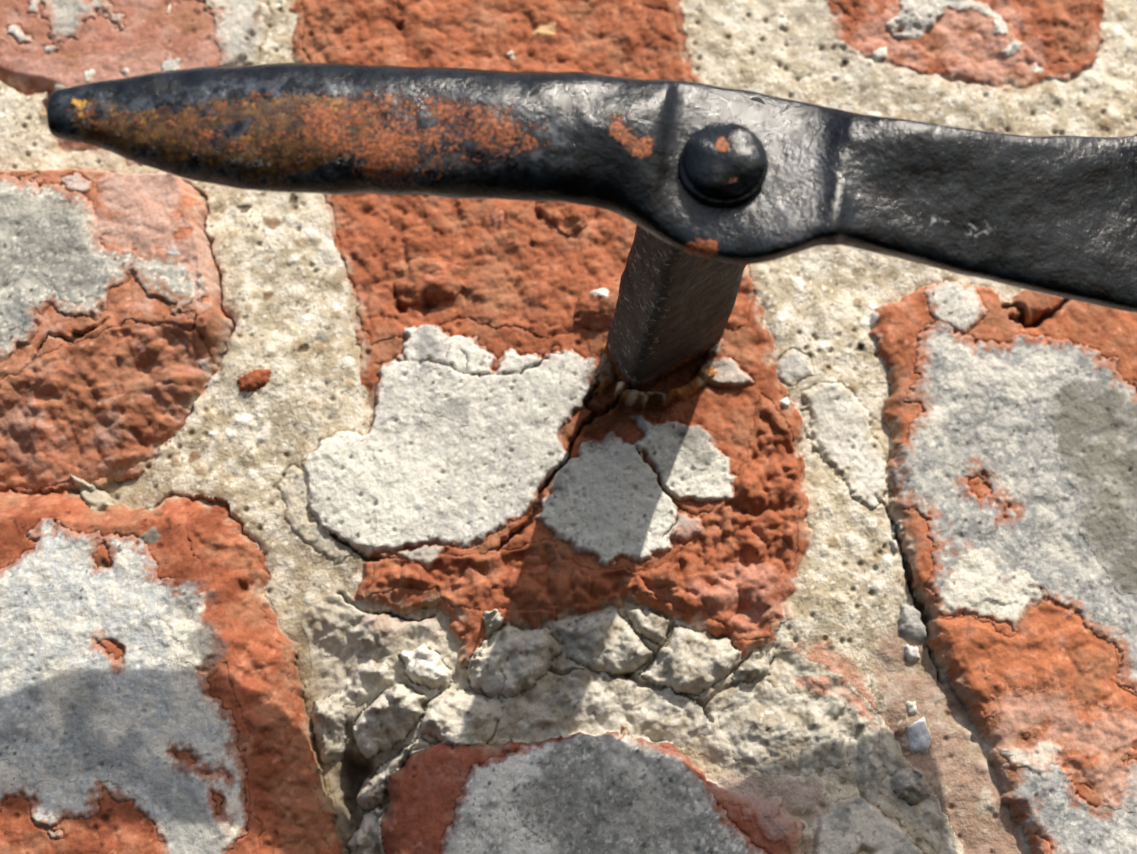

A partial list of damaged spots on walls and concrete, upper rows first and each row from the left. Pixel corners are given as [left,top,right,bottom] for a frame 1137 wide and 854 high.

spalling [300,0,693,82]
spalling [999,0,1092,64]
peeling [60,172,92,194]
spalling [323,193,637,346]
spalling [725,264,755,331]
spalling [0,319,219,492]
crack [496,381,631,552]
crack [363,608,436,622]
spalling [185,392,965,854]
crack [626,615,744,697]
crack [875,494,940,682]
spalling [926,600,1137,721]